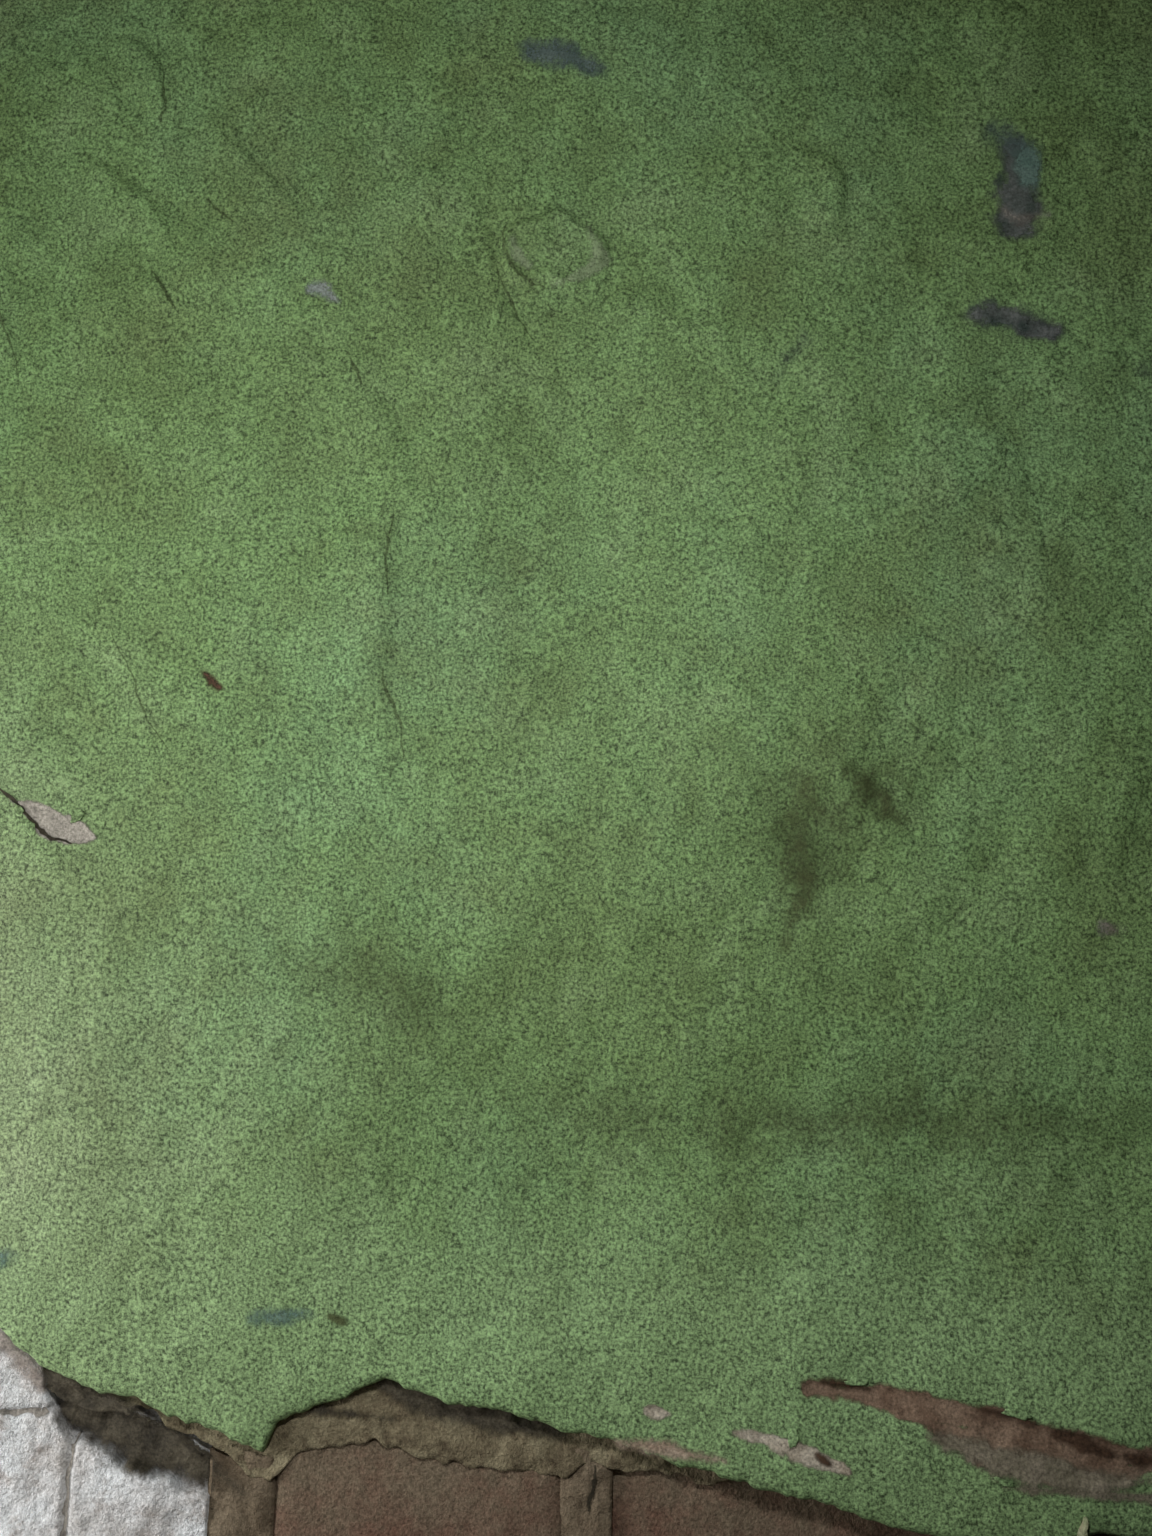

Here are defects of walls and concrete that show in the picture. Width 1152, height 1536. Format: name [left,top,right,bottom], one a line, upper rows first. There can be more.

leakage [990,128,1042,238]
leakage [964,300,1060,341]
peeling [11,800,96,844]
flaking render [0,1329,933,1536]
flaking render [801,1377,1152,1495]